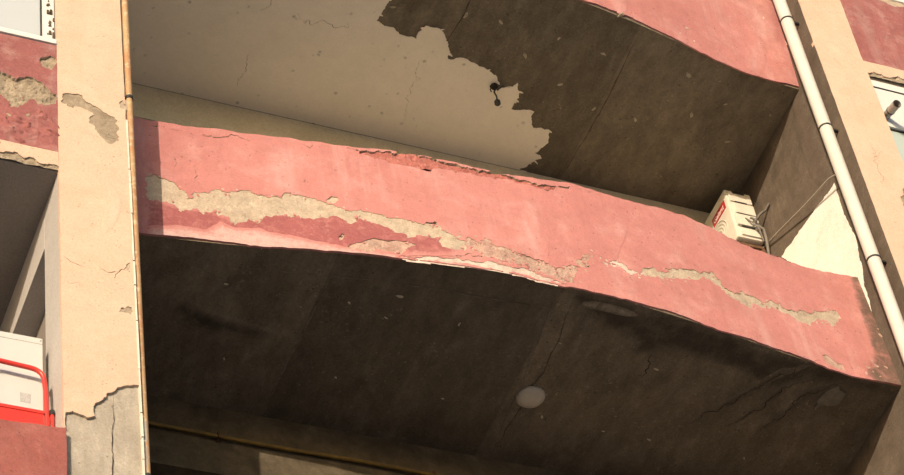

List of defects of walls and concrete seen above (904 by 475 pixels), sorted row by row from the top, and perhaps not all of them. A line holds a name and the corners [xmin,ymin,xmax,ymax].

flaking render [0,73,128,144]
peeling [360,0,797,212]
spalling [0,152,59,170]
flaking render [141,173,841,326]
spalling [65,387,148,475]
crack [691,362,813,422]